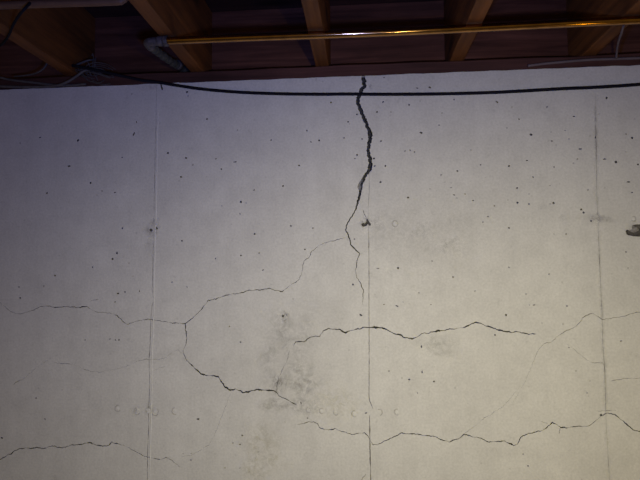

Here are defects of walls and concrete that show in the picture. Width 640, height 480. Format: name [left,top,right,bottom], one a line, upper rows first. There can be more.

crack [6,75,636,435]
crack [302,410,640,446]
crack [0,442,199,467]